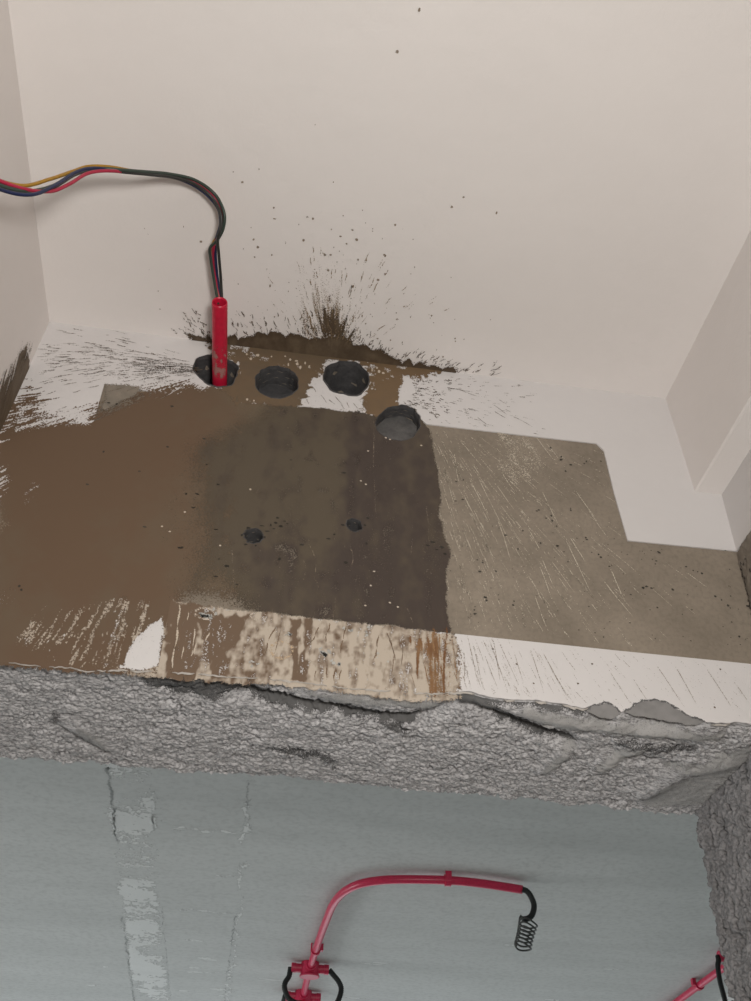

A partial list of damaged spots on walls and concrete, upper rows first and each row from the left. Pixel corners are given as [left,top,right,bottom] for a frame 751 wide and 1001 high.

spalling [9,662,258,700]
spalling [562,699,730,726]
spalling [265,747,339,771]
spalling [616,738,699,756]